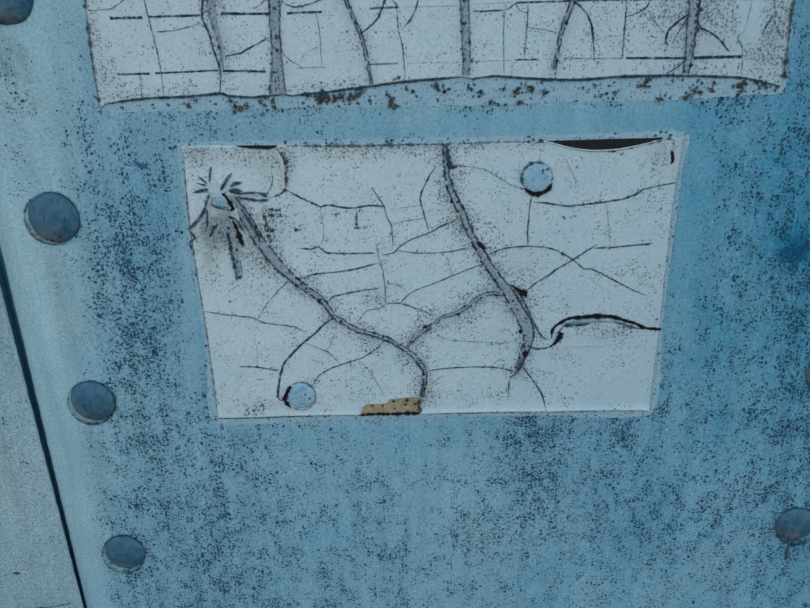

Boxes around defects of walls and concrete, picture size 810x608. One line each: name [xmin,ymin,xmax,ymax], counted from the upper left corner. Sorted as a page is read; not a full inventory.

crack [84,0,796,113]
crack [185,141,676,419]
peeling [358,397,422,416]